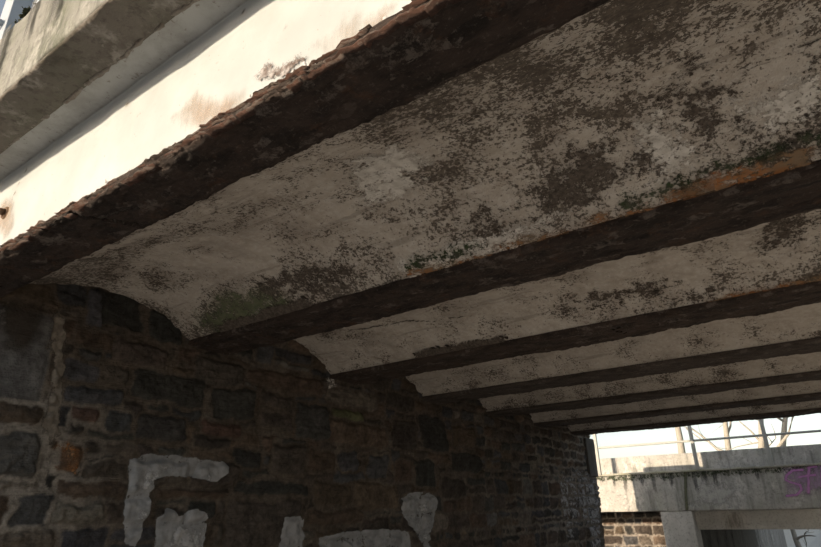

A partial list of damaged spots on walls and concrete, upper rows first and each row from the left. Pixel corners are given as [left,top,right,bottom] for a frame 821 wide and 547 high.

peeling [0,0,462,252]
rust [619,147,814,219]
peeling [216,254,364,332]